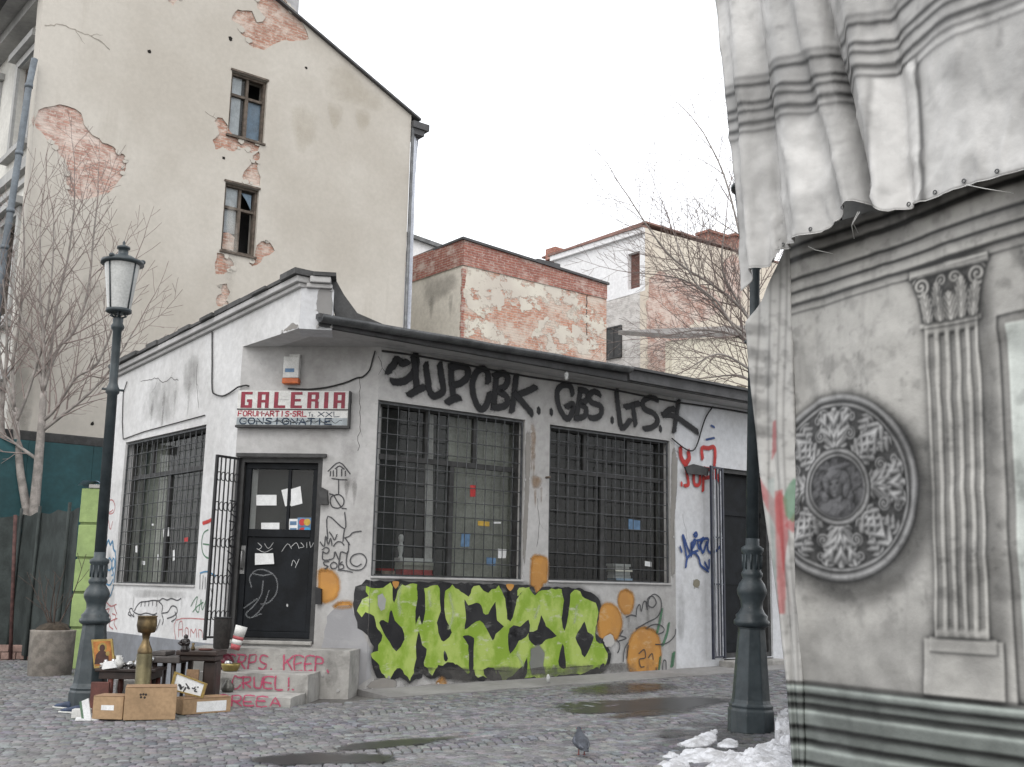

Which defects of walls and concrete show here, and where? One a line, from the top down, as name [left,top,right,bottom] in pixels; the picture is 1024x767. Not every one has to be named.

crack [45,24,110,50]
flaking render [229,0,308,50]
flaking render [32,105,128,199]
flaking render [213,118,261,186]
flaking render [249,238,274,266]
flaking render [215,253,237,307]
flaking render [463,266,608,355]